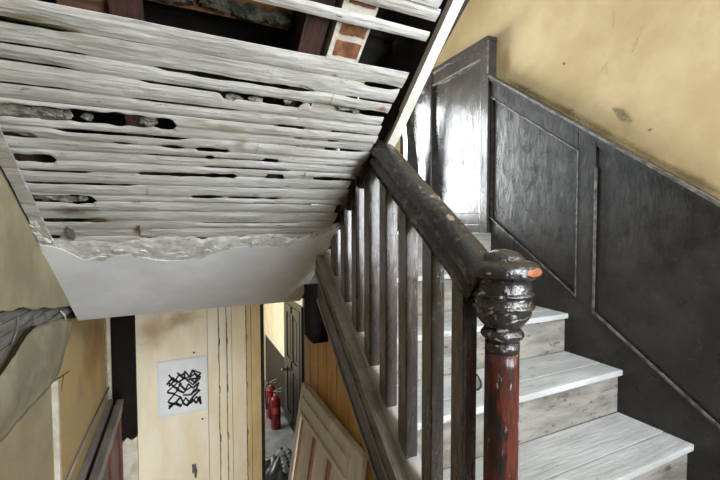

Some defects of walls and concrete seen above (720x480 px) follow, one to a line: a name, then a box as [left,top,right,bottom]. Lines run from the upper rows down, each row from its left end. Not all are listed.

peeling [349,0,376,10]
peeling [332,23,368,60]
flaking render [29,220,338,261]